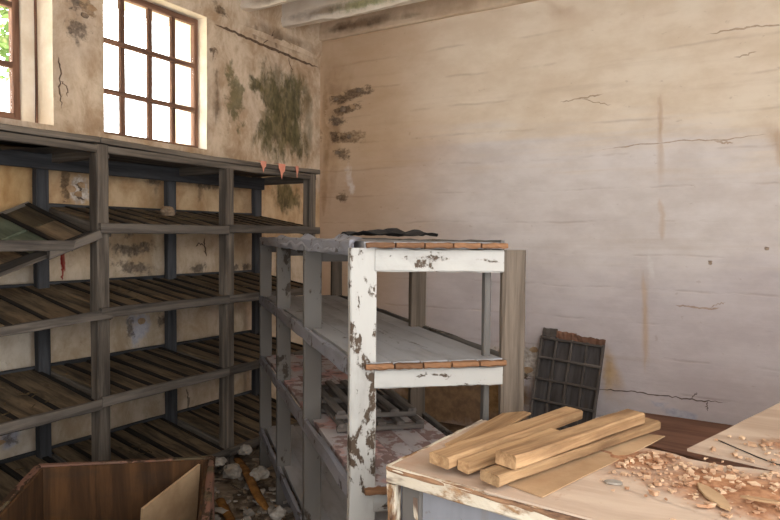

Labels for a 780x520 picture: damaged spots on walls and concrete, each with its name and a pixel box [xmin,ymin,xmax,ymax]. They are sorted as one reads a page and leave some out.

leakage [58,0,99,50]
crack [706,24,780,35]
crack [558,93,614,106]
leakage [231,0,431,224]
crack [597,134,766,151]
peeling [524,342,540,377]
crack [599,389,728,411]